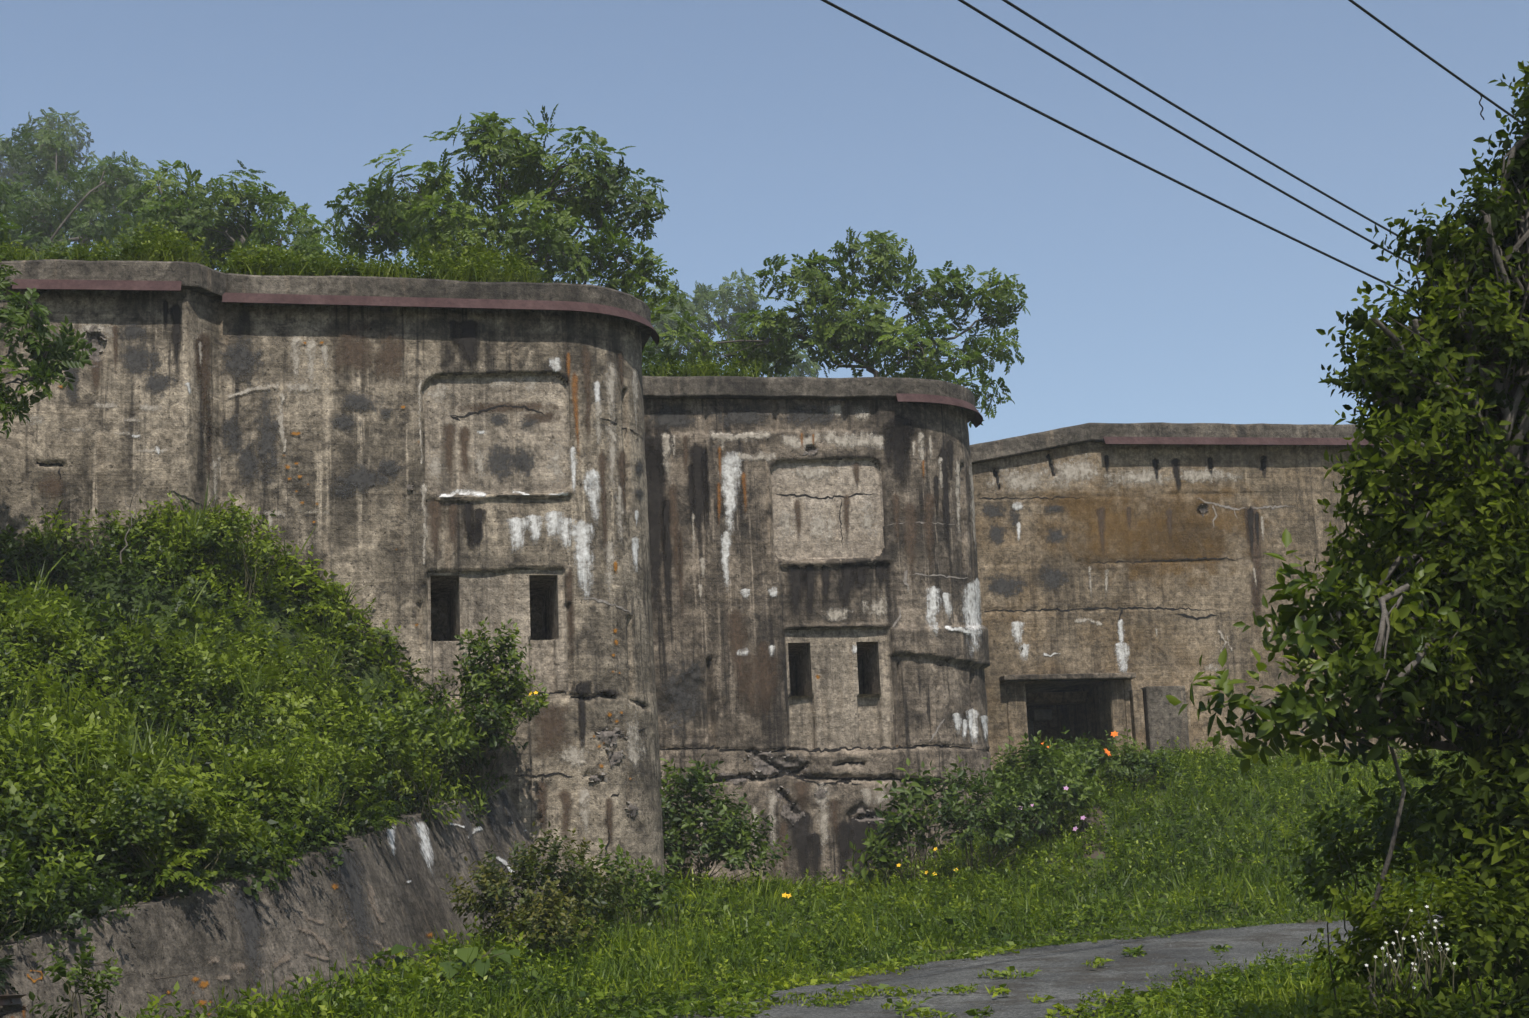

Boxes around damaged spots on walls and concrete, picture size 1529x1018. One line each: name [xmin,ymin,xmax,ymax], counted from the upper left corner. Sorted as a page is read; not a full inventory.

leakage [449,320,483,367]
leakage [332,392,391,430]
leakage [582,346,600,433]
leakage [429,403,555,550]
leakage [509,404,953,714]
leakage [982,502,1023,545]
leakage [926,566,1069,649]
crack [430,683,985,811]
leakage [953,709,988,741]
leakage [417,822,433,867]
leakage [450,781,571,872]
crack [605,794,619,857]